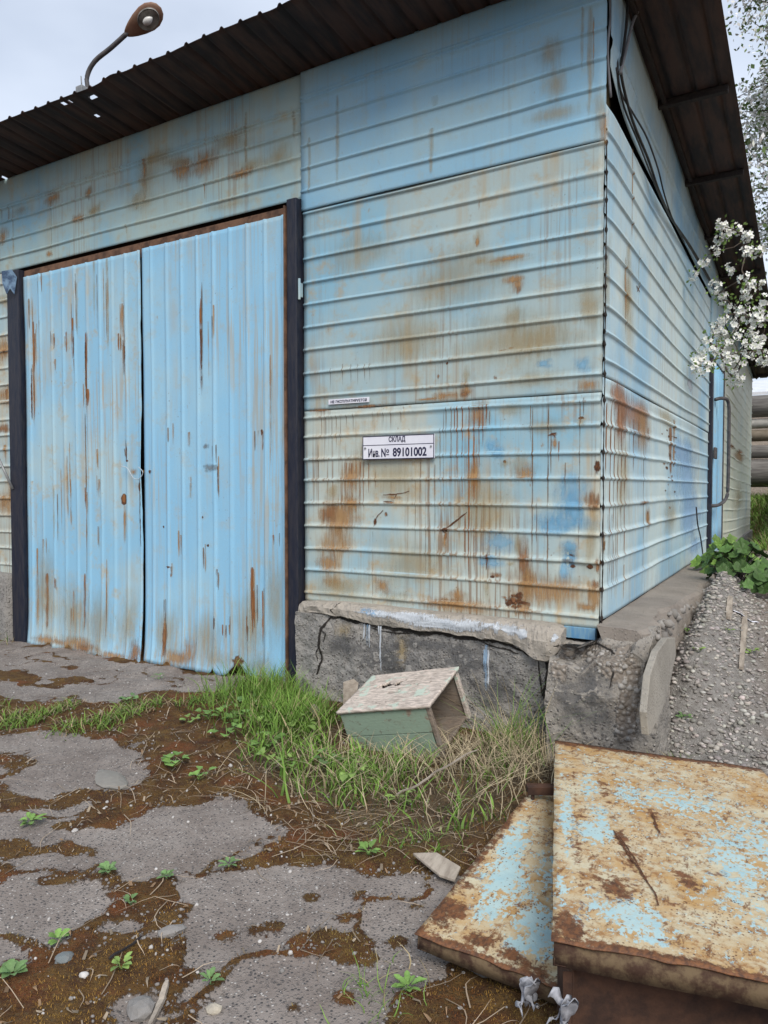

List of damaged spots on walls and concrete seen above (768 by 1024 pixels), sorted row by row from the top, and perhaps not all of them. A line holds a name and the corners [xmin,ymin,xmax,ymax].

rust [28,299,37,417]
rust [50,311,89,405]
rust [199,286,214,385]
rust [419,384,499,578]
rust [579,387,677,610]
rust [36,549,140,660]
rust [246,568,263,641]
damp [427,601,481,612]
rust [503,546,532,614]
damp [518,576,574,601]
crack [316,603,615,734]
spalling [551,638,641,744]